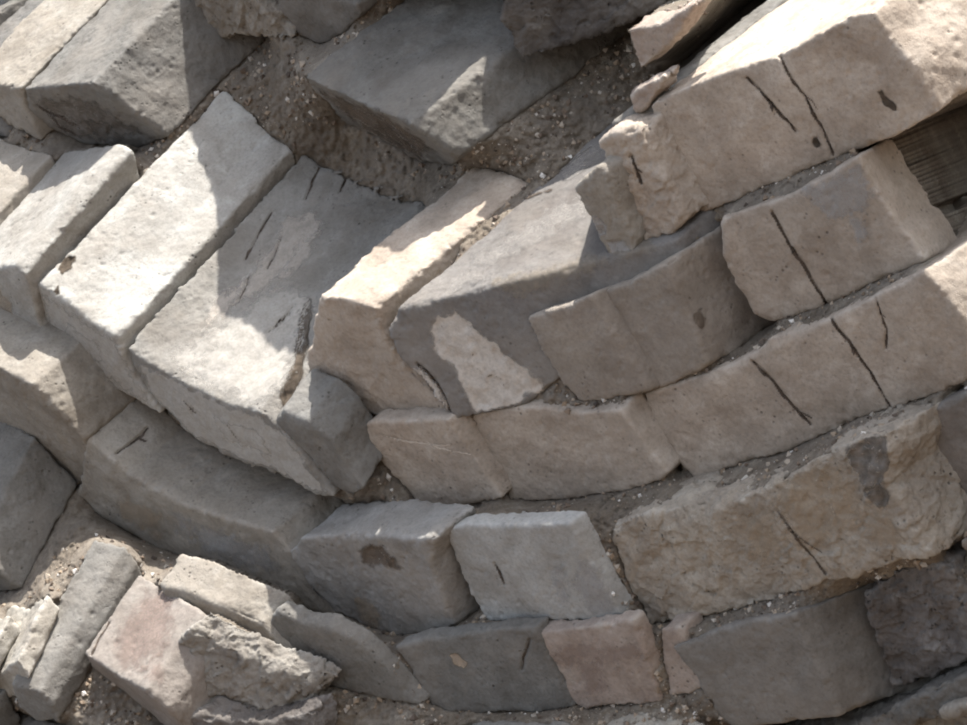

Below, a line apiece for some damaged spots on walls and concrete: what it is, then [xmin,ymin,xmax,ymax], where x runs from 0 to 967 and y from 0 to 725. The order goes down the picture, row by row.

crack [746,57,834,156]
crack [771,212,891,407]
crack [752,361,812,425]